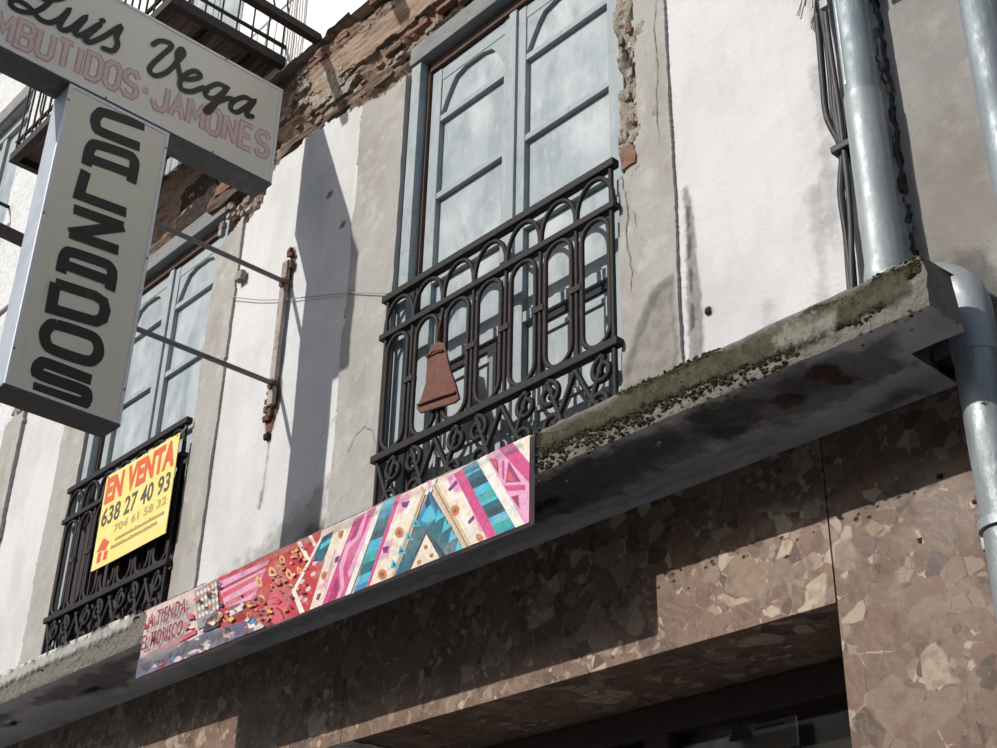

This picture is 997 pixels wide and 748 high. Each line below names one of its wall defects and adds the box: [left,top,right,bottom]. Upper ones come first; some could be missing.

peeling [273,0,474,171]
spalling [613,0,645,176]
rust [287,247,295,279]
rust [804,365,860,386]
rust [262,377,281,460]
leakage [33,654,140,704]